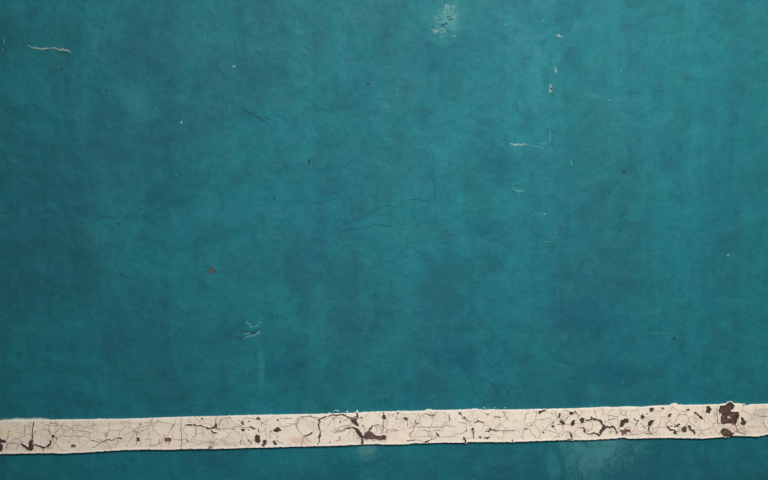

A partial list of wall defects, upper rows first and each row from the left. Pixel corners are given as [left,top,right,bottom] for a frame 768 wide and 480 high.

peeling [426,0,468,48]
crack [5,418,240,452]
spalling [236,416,295,447]
spalling [339,411,419,444]
crack [296,410,533,446]
crack [557,410,619,441]
crack [642,407,683,436]
spalling [607,401,747,438]
crack [716,408,767,435]